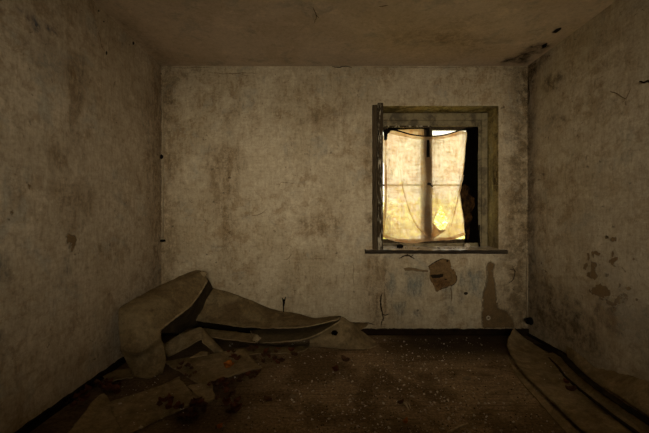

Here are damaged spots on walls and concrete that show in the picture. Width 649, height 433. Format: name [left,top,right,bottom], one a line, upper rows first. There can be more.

leakage [499,43,596,341]
crack [366,294,388,325]
spalling [403,258,461,292]
peeling [583,251,631,312]